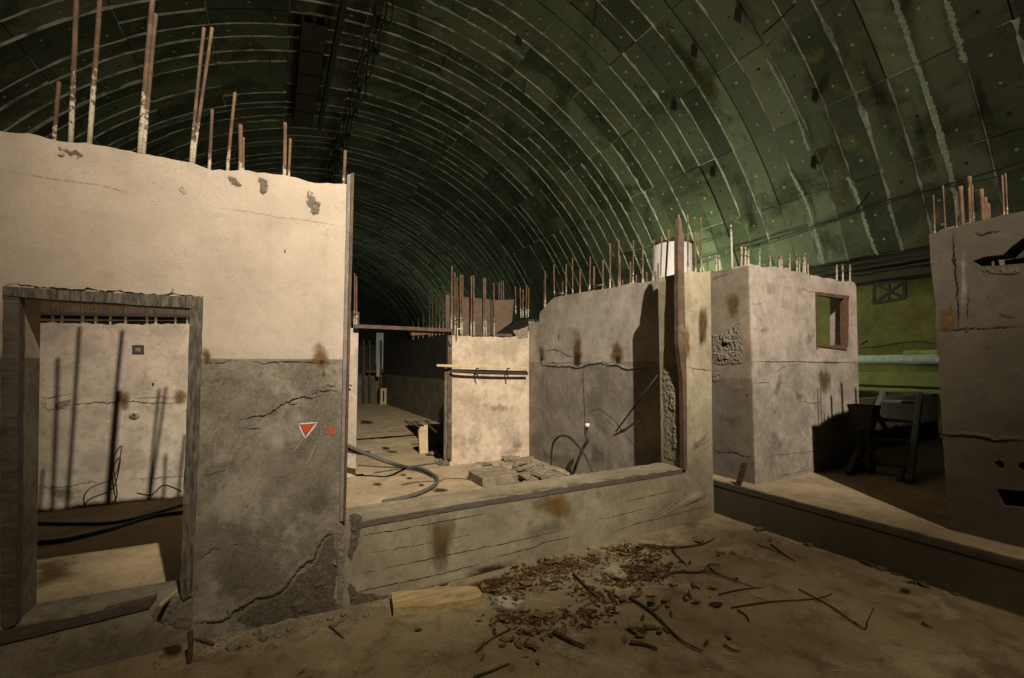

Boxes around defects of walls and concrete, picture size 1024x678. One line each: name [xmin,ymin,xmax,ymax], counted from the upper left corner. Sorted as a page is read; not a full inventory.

spalling [52,0,103,158]
spalling [226,92,245,187]
spalling [306,191,321,215]
crack [944,230,1021,330]
crack [206,360,338,429]
rust [315,351,327,376]
crack [539,345,665,449]
rust [612,343,622,363]
rust [686,310,707,357]
spalling [712,322,744,382]
crack [192,527,334,625]
rust [434,526,450,560]